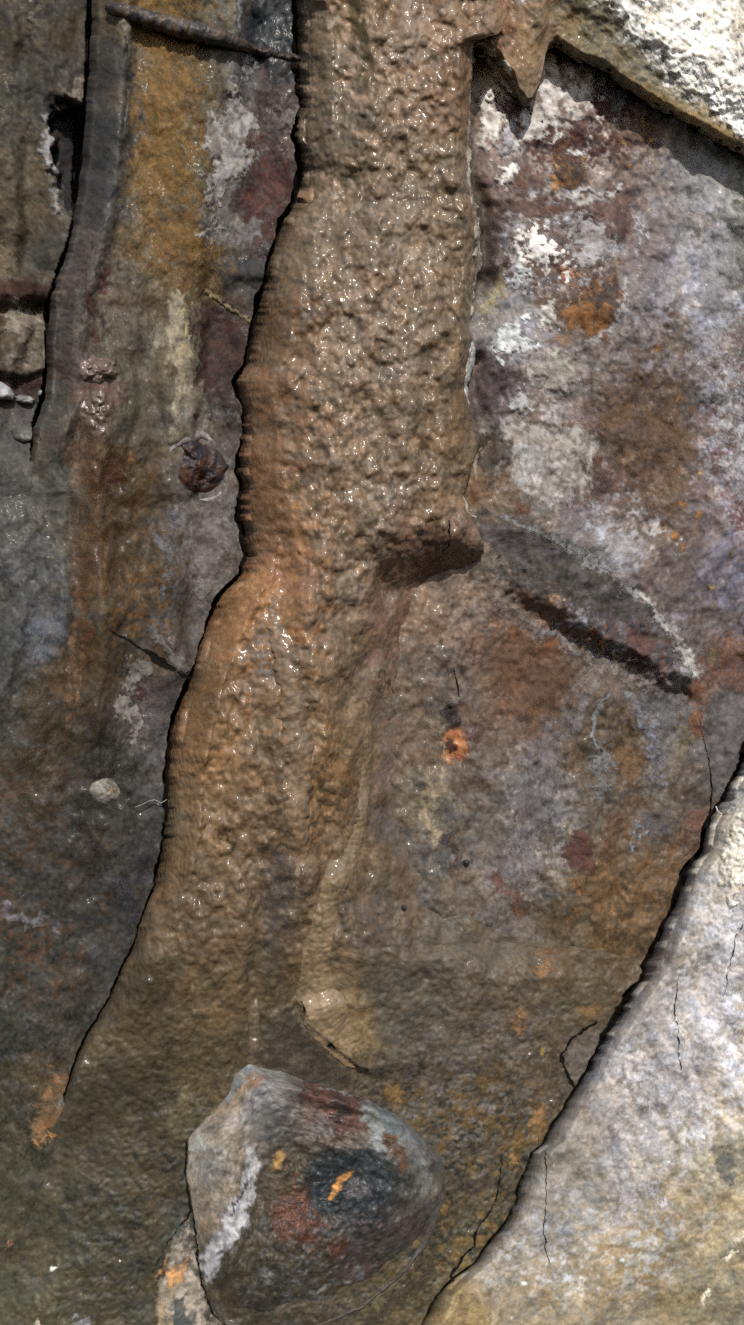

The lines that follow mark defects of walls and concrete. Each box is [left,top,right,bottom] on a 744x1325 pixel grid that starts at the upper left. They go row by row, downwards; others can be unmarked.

crack [30,0,90,461]
crack [107,0,303,908]
damp [195,0,294,248]
peeling [464,341,476,409]
peeling [466,137,483,316]
rust [551,273,630,347]
rust [583,316,714,551]
damp [594,0,744,139]
damp [417,765,473,875]
damp [482,595,703,939]
crack [421,718,744,1325]
rust [244,1071,434,1260]